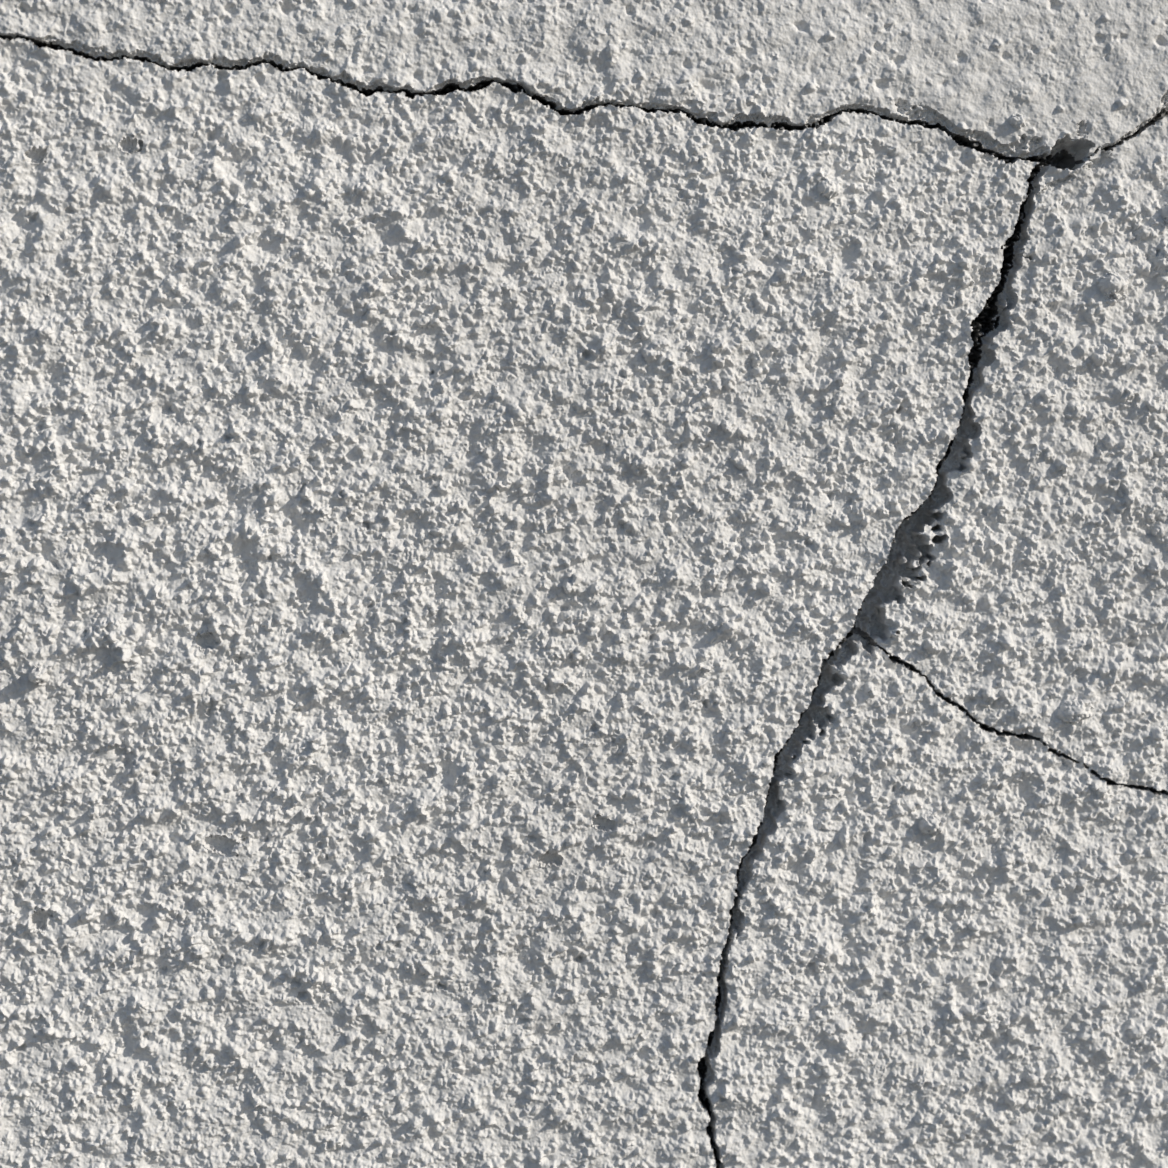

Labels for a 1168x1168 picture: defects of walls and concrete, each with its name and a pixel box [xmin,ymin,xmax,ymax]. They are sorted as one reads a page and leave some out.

crack [0,30,1052,167]
crack [1094,89,1168,156]
crack [693,164,1168,1168]